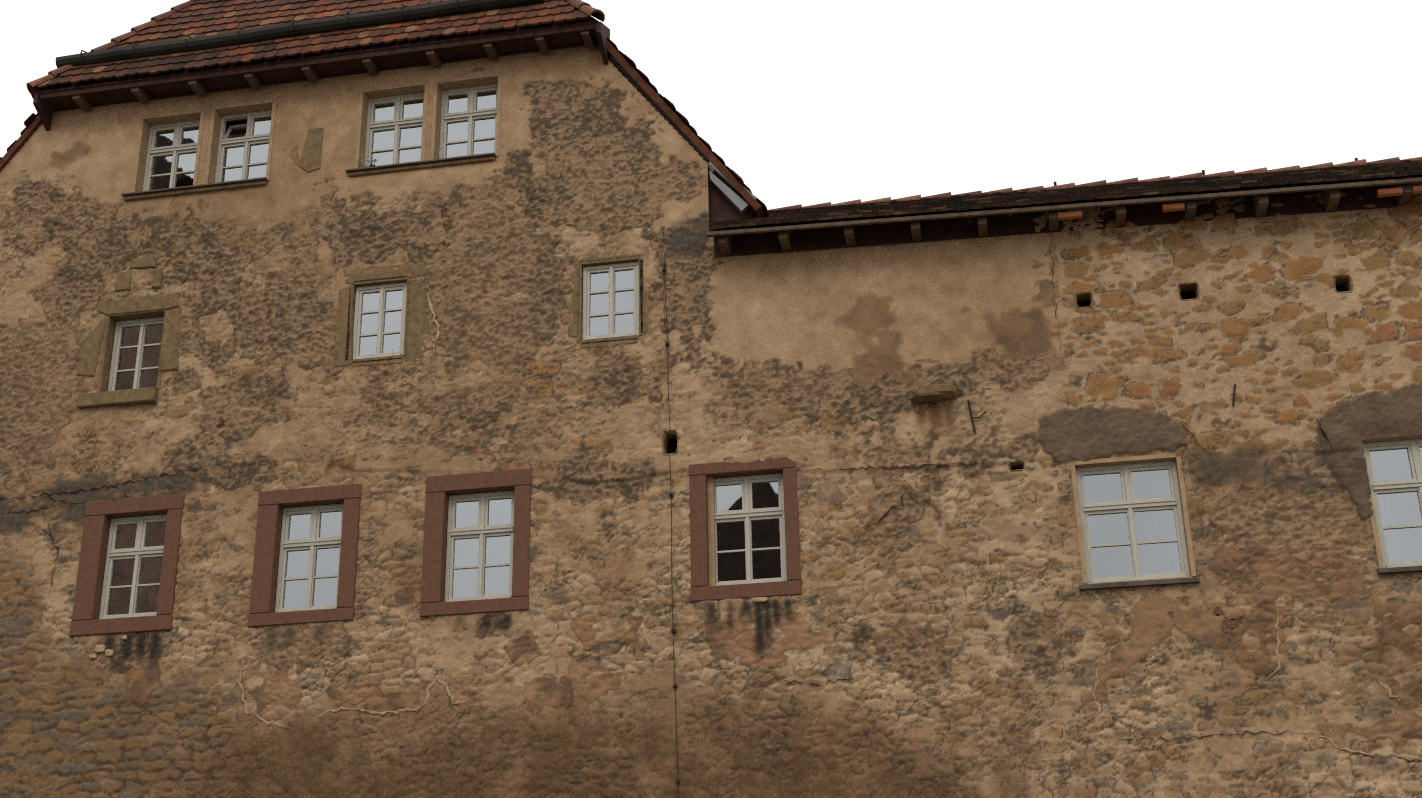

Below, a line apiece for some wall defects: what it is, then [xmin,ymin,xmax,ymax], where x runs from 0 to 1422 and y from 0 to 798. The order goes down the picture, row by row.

spalling [0,77,1064,550]
water stain [730,600,791,650]
crack [1106,730,1312,742]